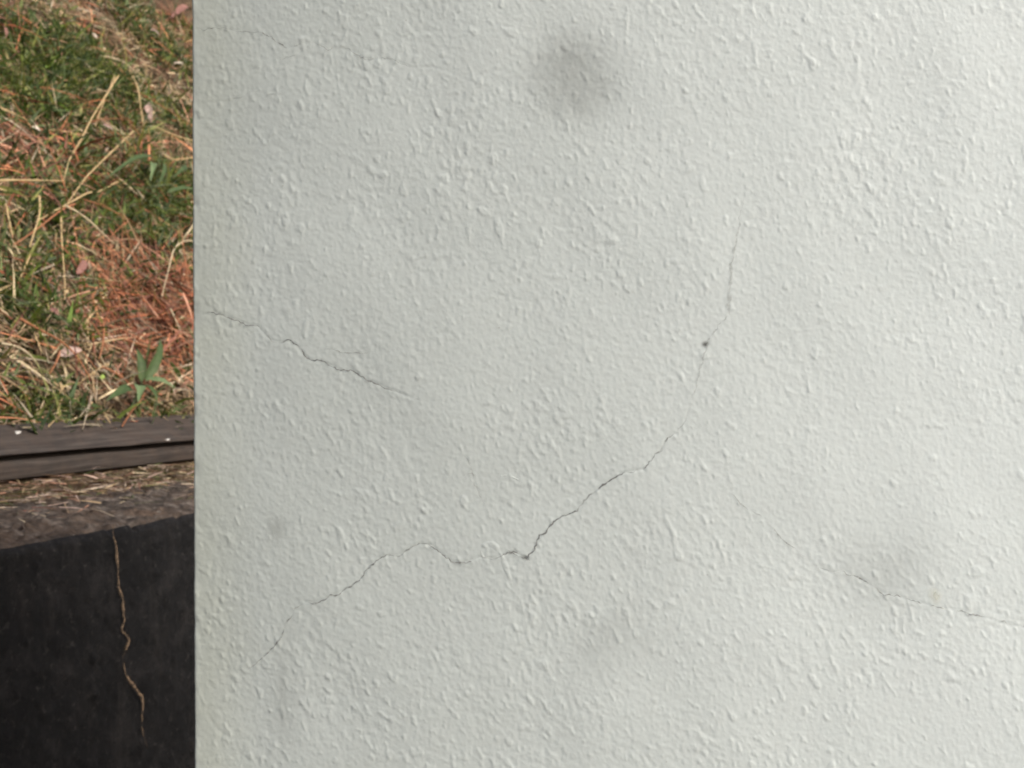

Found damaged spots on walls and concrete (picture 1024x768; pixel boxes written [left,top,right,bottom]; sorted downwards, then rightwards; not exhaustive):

crack [287,339,386,389]
crack [311,438,668,604]
crack [113,531,144,734]